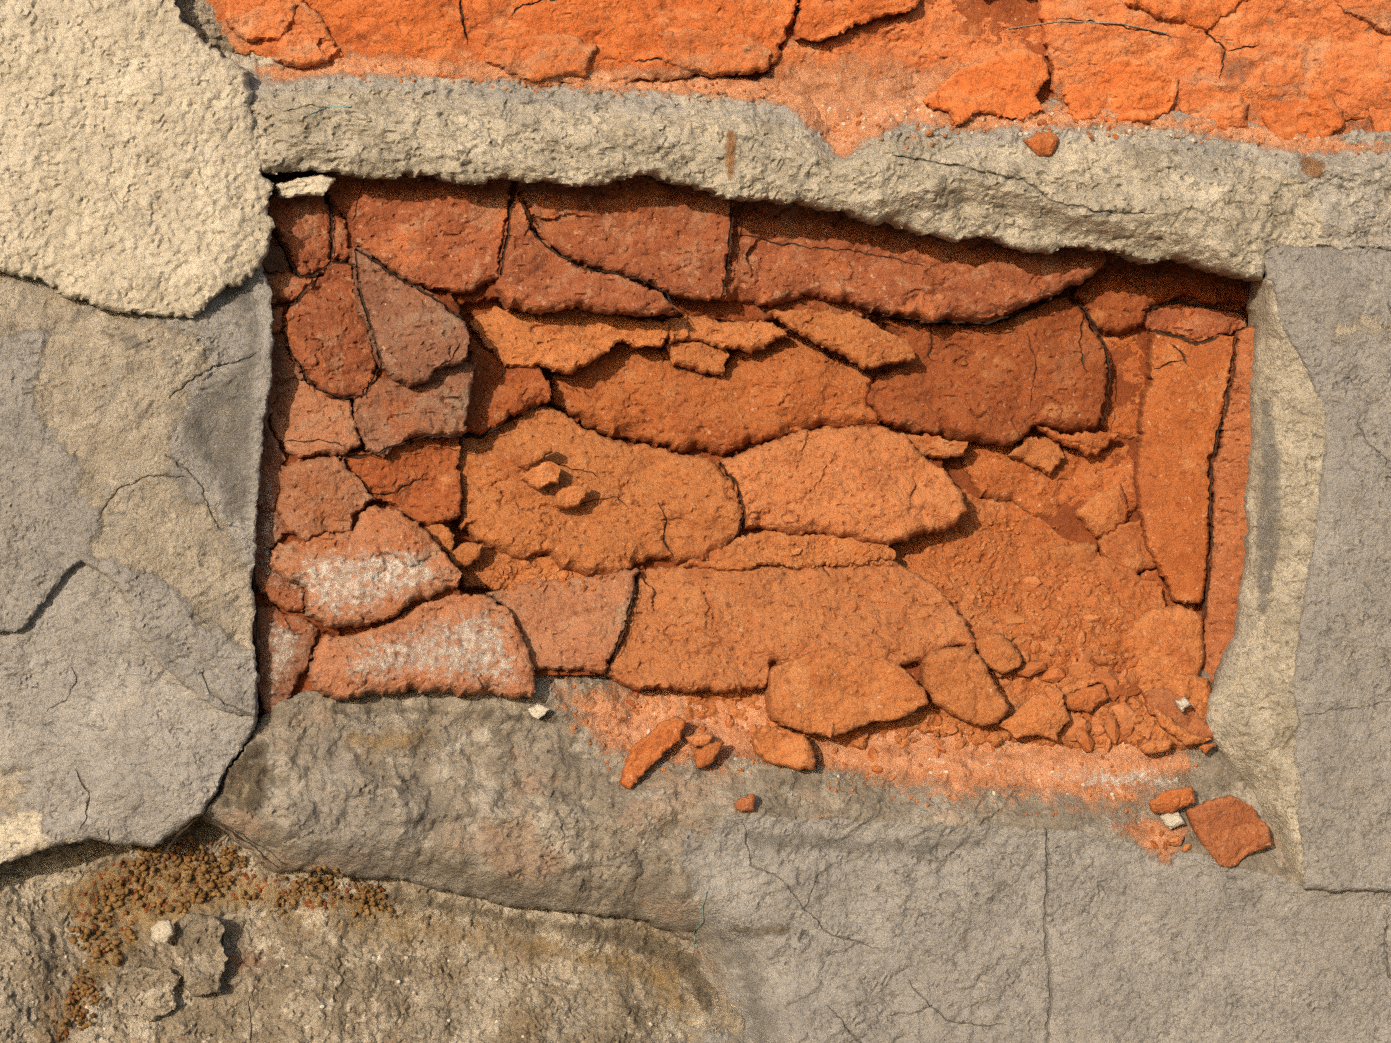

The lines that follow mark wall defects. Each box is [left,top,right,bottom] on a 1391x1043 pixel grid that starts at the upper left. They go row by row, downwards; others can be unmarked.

peeling [206,0,1049,125]
peeling [1124,0,1247,33]
peeling [1062,56,1345,141]
peeling [1335,0,1391,35]
peeling [1368,106,1391,133]
spalling [0,171,1327,886]
damp [61,865,381,978]
crack [745,828,871,948]
crack [1044,832,1052,1043]
crack [892,987,995,1026]